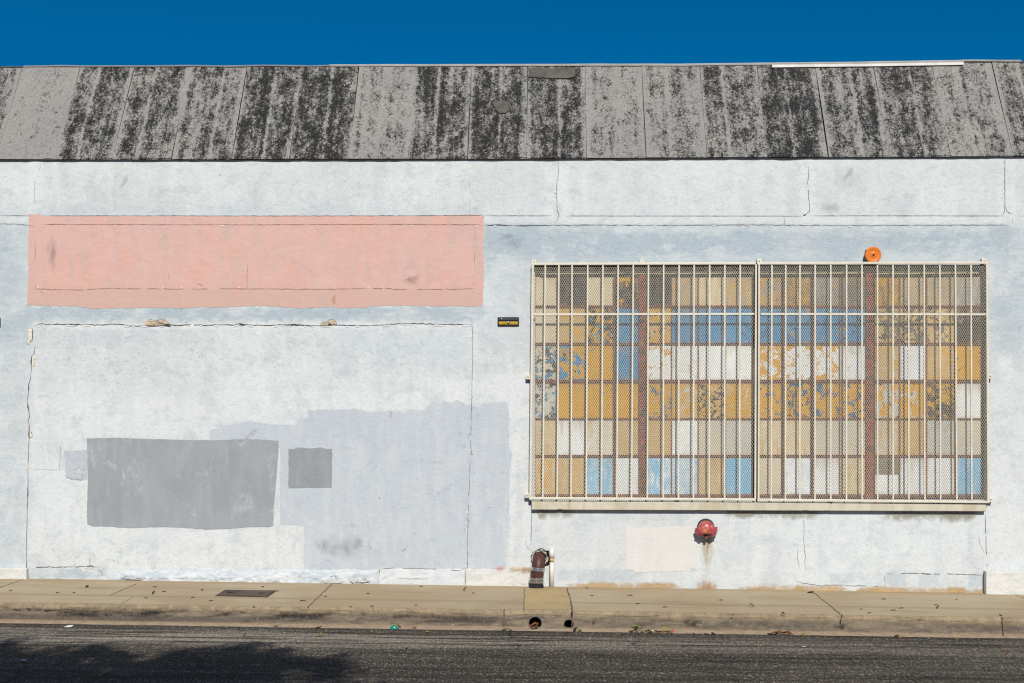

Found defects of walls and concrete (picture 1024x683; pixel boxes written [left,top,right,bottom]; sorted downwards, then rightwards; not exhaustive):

crack [0,163,663,227]
crack [713,170,1011,227]